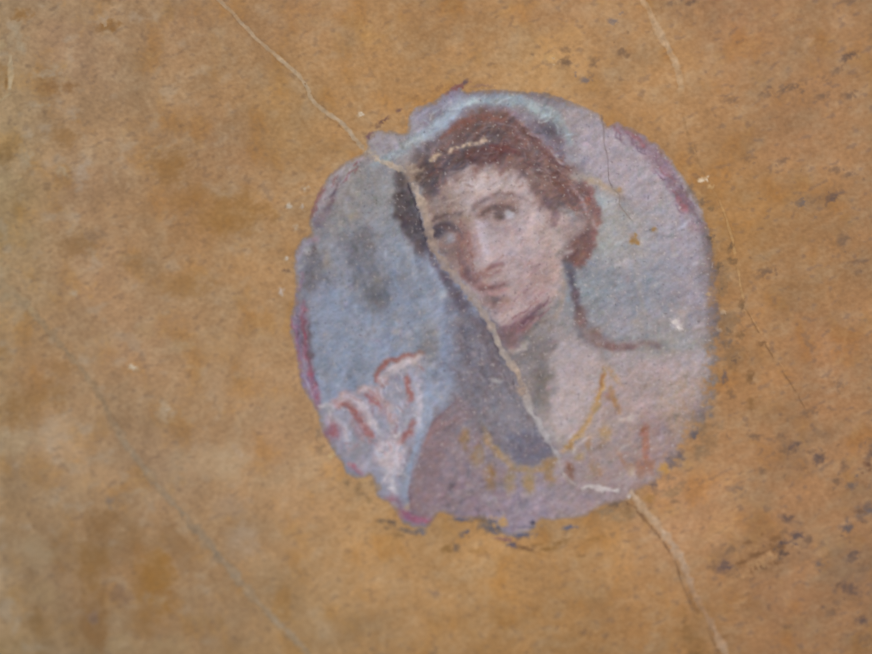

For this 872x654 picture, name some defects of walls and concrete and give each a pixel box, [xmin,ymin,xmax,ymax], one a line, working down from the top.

crack [216,0,729,654]
crack [638,0,810,416]